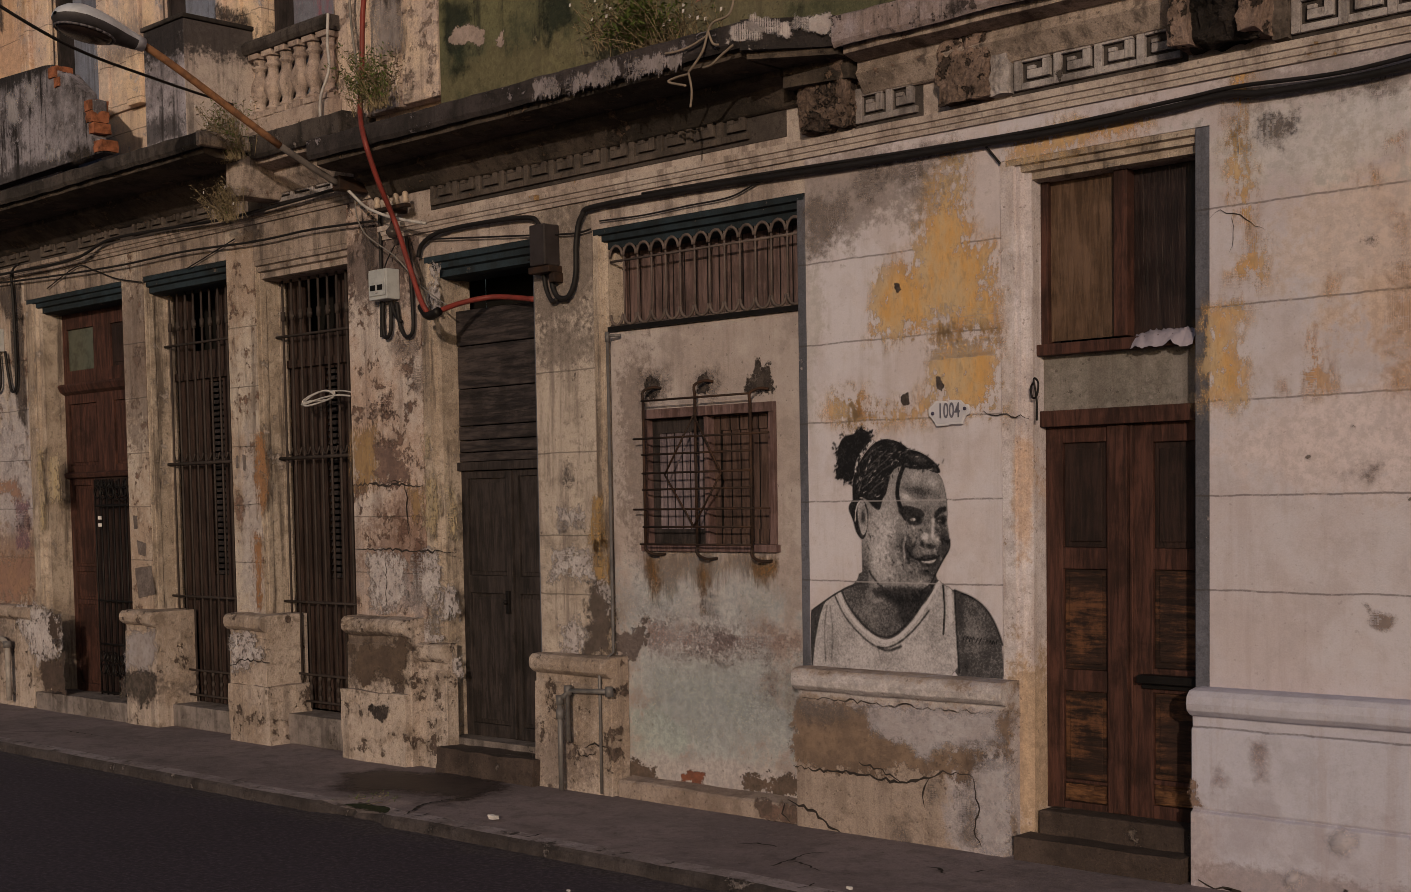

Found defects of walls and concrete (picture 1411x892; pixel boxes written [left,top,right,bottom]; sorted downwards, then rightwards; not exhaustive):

spalling [84,99,119,155]
peeling [424,261,441,310]
peeling [829,151,1004,430]
spalling [644,376,660,400]
spalling [696,372,714,394]
spalling [744,357,777,396]
peeling [14,447,62,550]
peeling [347,394,464,723]
corrosion [646,556,661,600]
peeling [16,599,67,701]
crack [802,697,991,714]
crack [781,762,981,846]